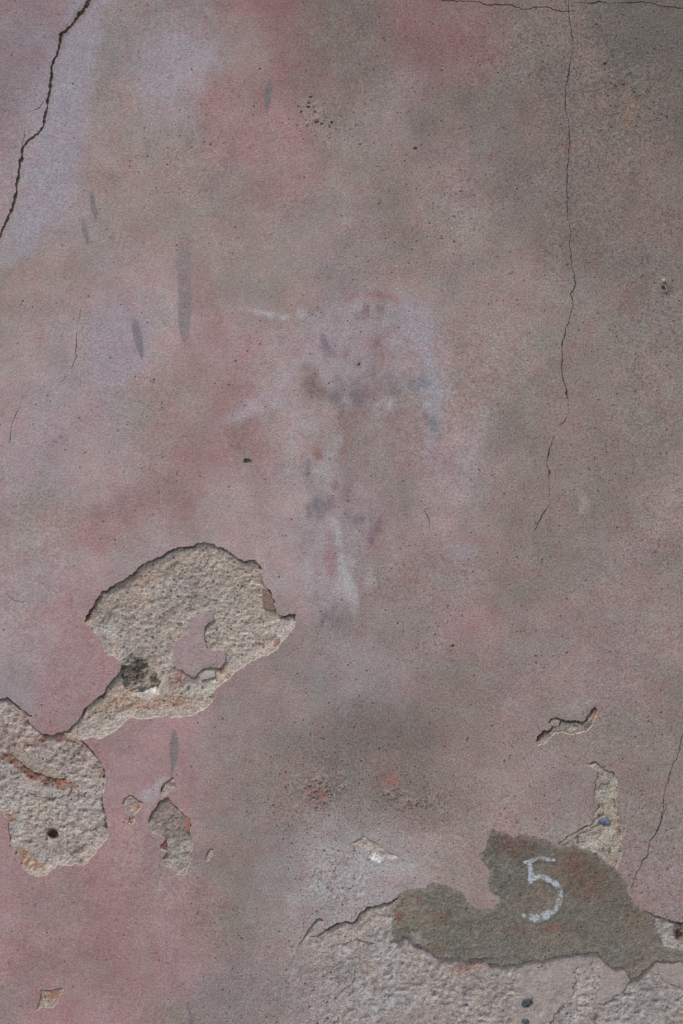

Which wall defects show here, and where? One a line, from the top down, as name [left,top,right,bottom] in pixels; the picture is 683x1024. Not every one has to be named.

crack [0,0,91,238]
crack [442,0,683,530]
flaking render [0,542,296,877]
flaking render [536,706,597,746]
flaking render [352,836,399,864]
flaking render [559,761,622,870]
crack [630,735,683,889]
flaking render [278,897,683,1024]